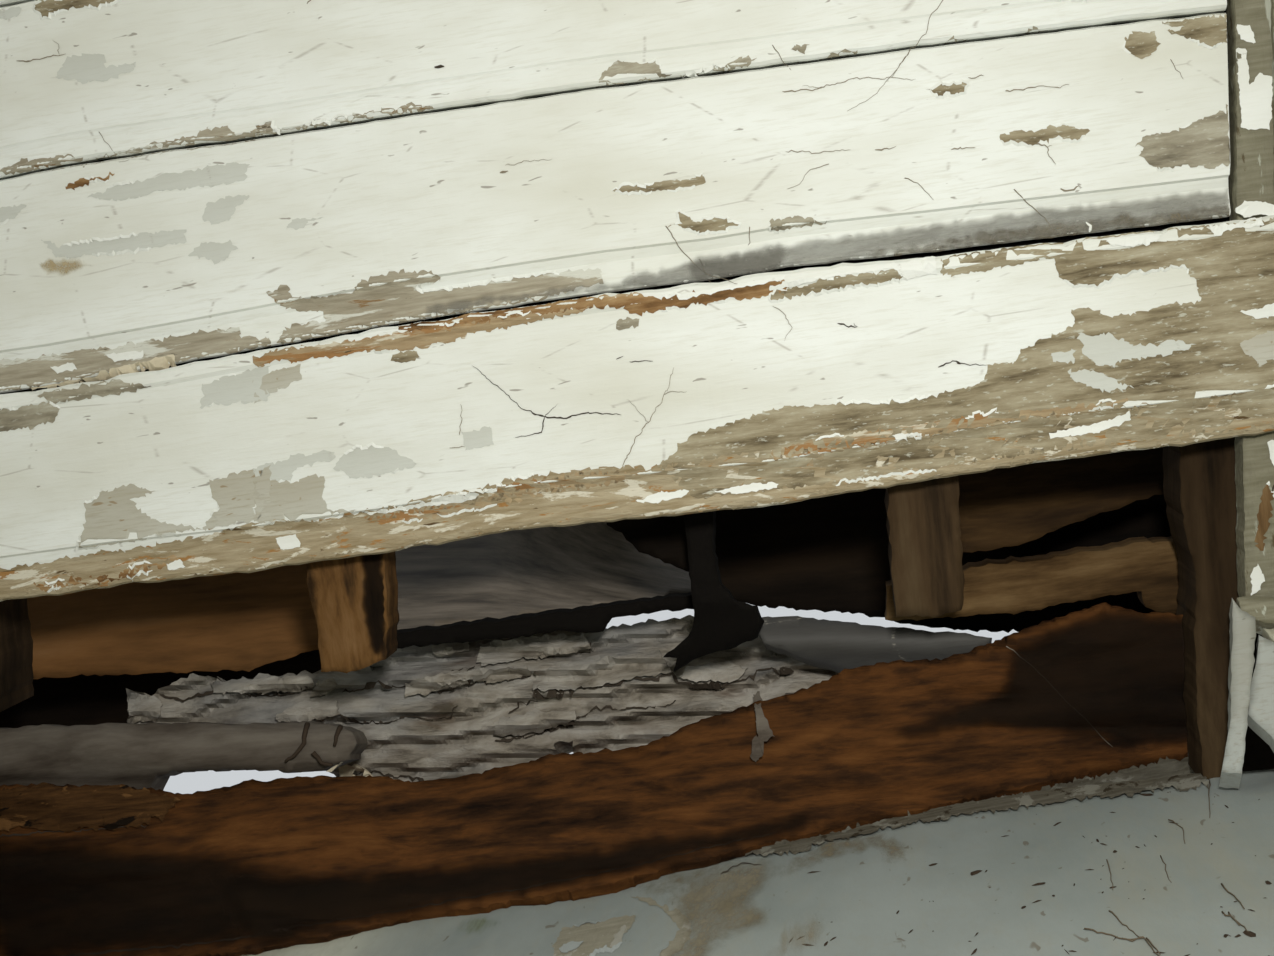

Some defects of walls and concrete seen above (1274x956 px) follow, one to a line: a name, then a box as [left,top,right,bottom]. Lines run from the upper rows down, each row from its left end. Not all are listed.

peeling [0,0,122,20]
crack [782,77,910,92]
peeling [1000,123,1090,147]
peeling [1136,104,1230,172]
peeling [0,102,434,225]
peeling [611,173,706,196]
crack [480,356,682,466]
peeling [0,200,1274,598]
peeling [552,915,636,956]